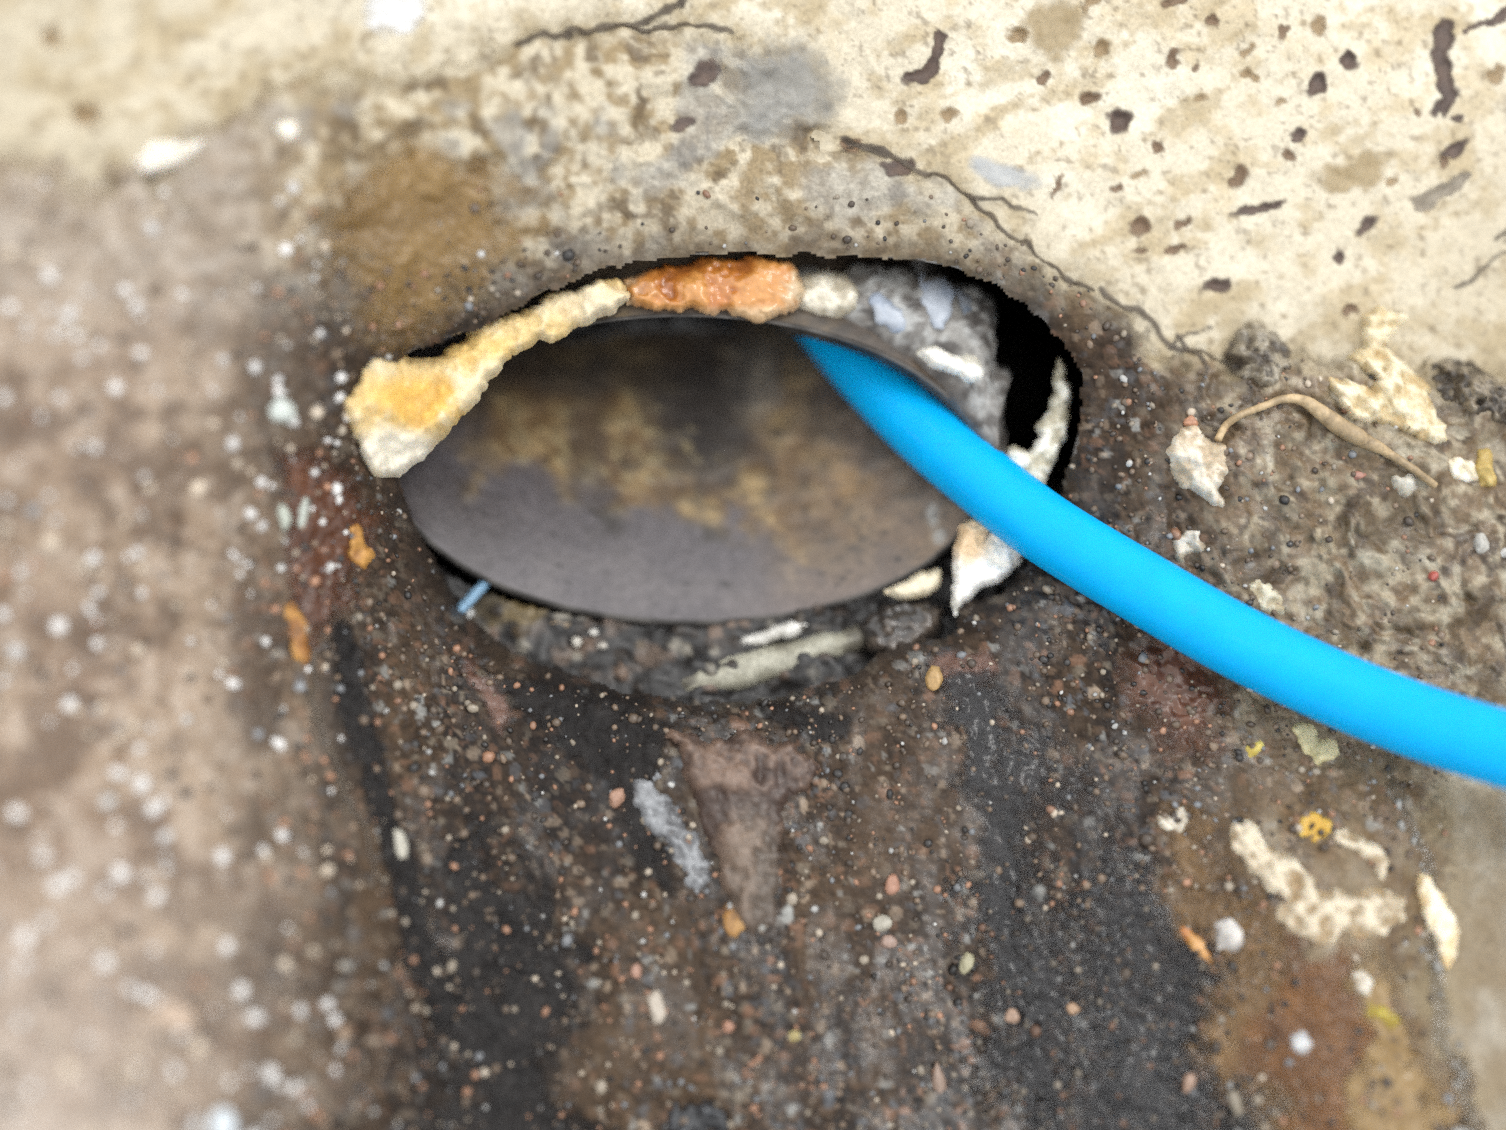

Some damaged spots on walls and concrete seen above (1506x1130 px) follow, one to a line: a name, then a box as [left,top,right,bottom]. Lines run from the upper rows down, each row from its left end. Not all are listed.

crack [514,0,734,47]
rust [621,255,806,324]
peeling [868,292,906,334]
peeling [919,273,972,330]
crack [841,136,1235,429]
water stain [759,702,852,742]
water stain [501,678,675,896]
water stain [333,623,596,1130]
water stain [949,672,1206,1130]